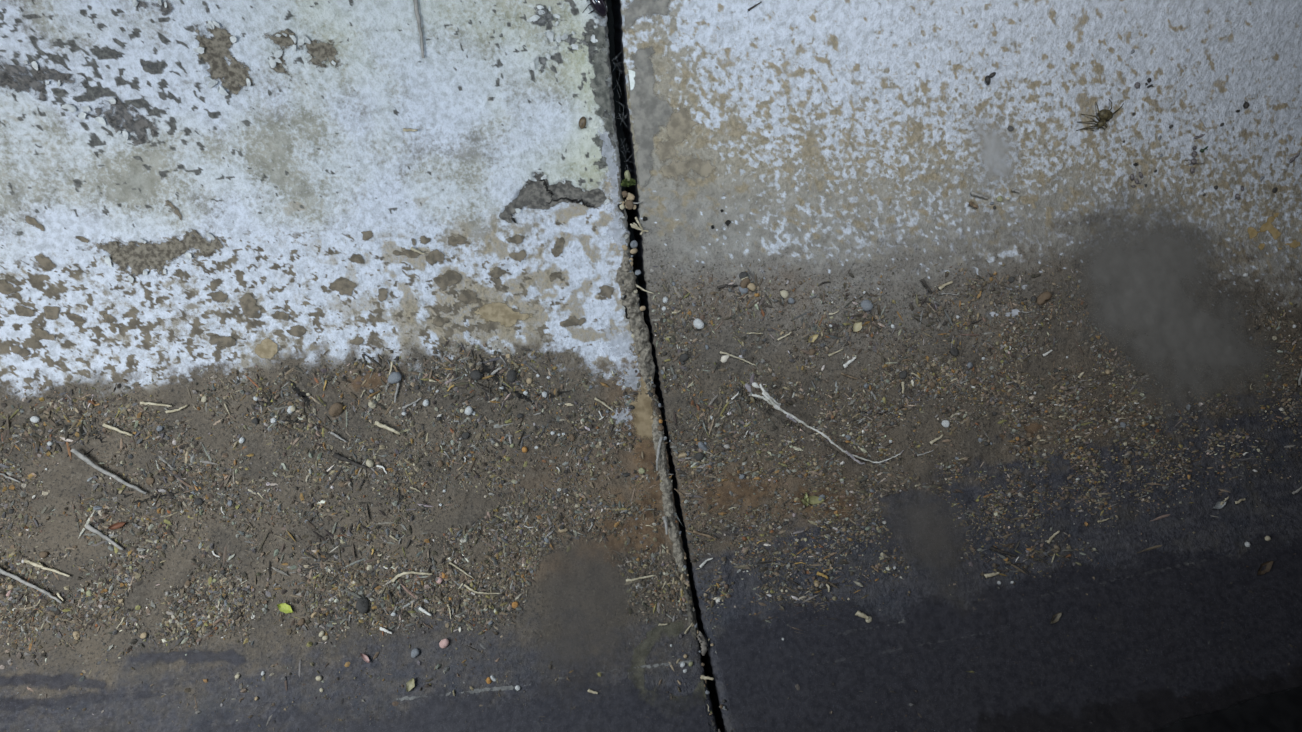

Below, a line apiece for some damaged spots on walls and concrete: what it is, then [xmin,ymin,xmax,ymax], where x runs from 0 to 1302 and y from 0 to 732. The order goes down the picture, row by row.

peeling [132,0,174,16]
peeling [193,20,255,96]
peeling [265,29,348,81]
peeling [527,4,598,73]
peeling [0,56,158,146]
spalling [499,172,629,240]
peeling [96,229,223,283]
damp [560,316,586,327]
damp [0,674,106,710]
damp [130,650,245,665]
damp [335,621,710,732]
damp [716,535,1302,732]